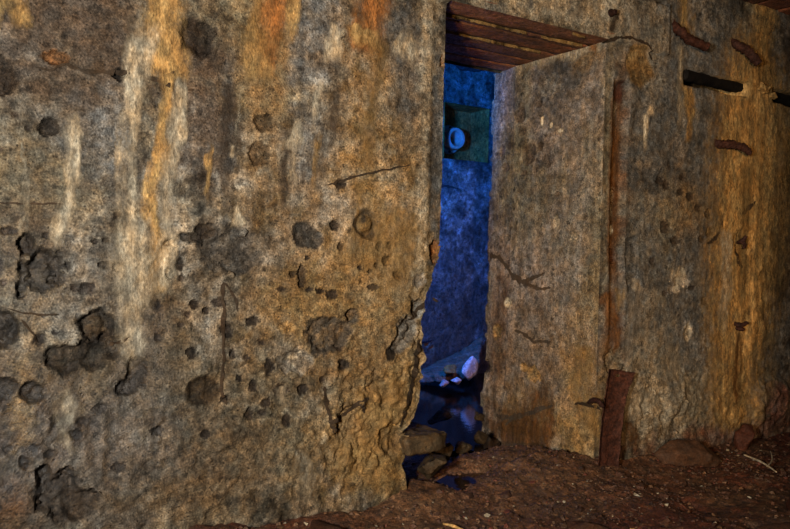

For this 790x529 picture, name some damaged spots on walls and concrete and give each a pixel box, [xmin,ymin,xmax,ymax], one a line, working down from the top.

corrosion [249,0,300,74]
crack [602,35,653,60]
corrosion [672,19,711,51]
crack [328,165,410,185]
corrosion [708,4,785,428]
spalling [0,225,97,300]
crack [490,252,550,291]
spalling [0,306,23,350]
spalling [31,306,150,397]
spalling [0,376,48,406]
spalling [333,367,408,461]
corrosion [598,369,635,467]